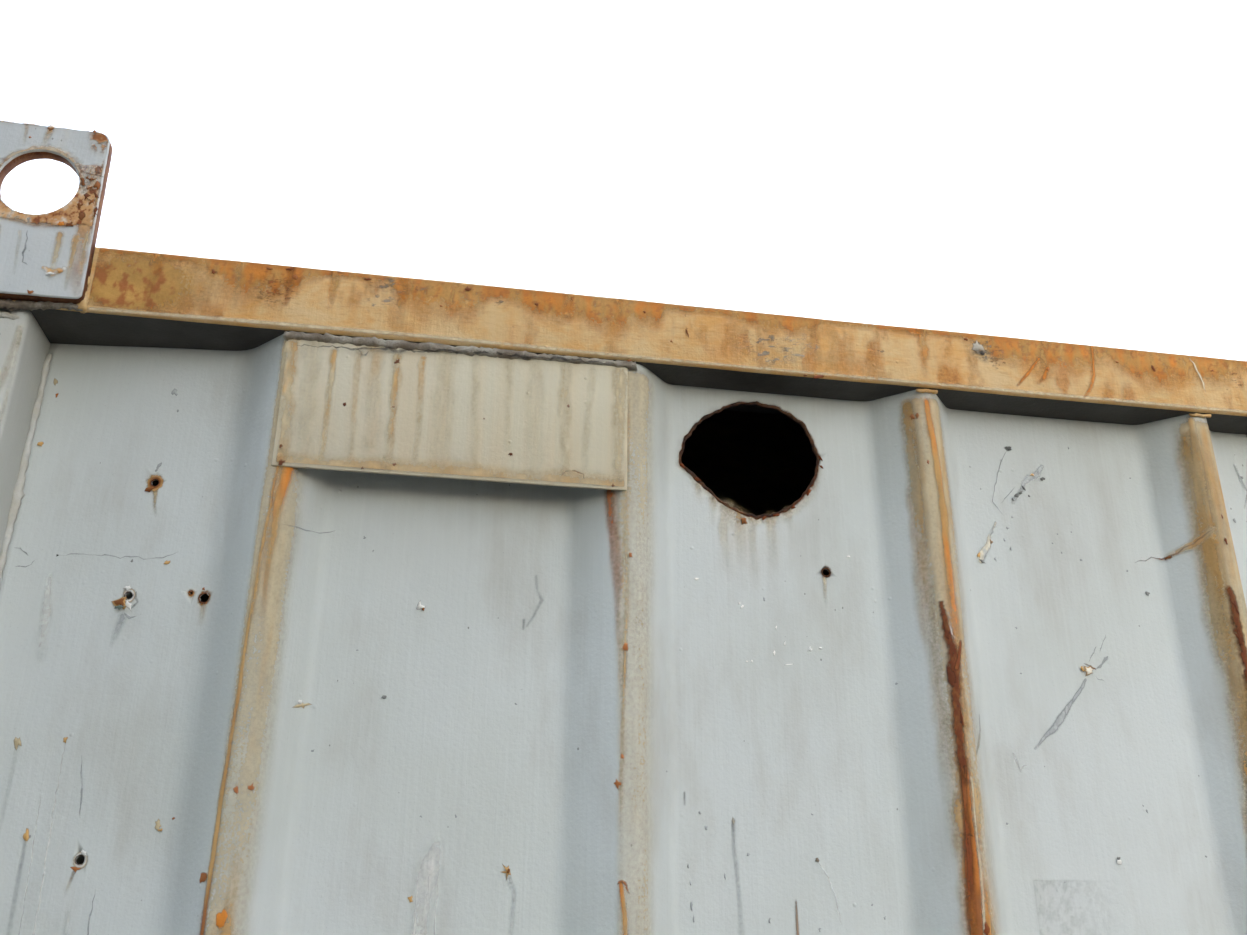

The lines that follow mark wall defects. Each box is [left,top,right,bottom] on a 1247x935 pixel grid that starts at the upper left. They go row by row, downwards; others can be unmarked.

corrosion [0,120,108,276]
corrosion [90,248,1247,393]
corrosion [145,475,163,502]
corrosion [200,341,648,935]
corrosion [902,398,995,935]
corrosion [1179,418,1247,782]
corrosion [70,853,87,879]